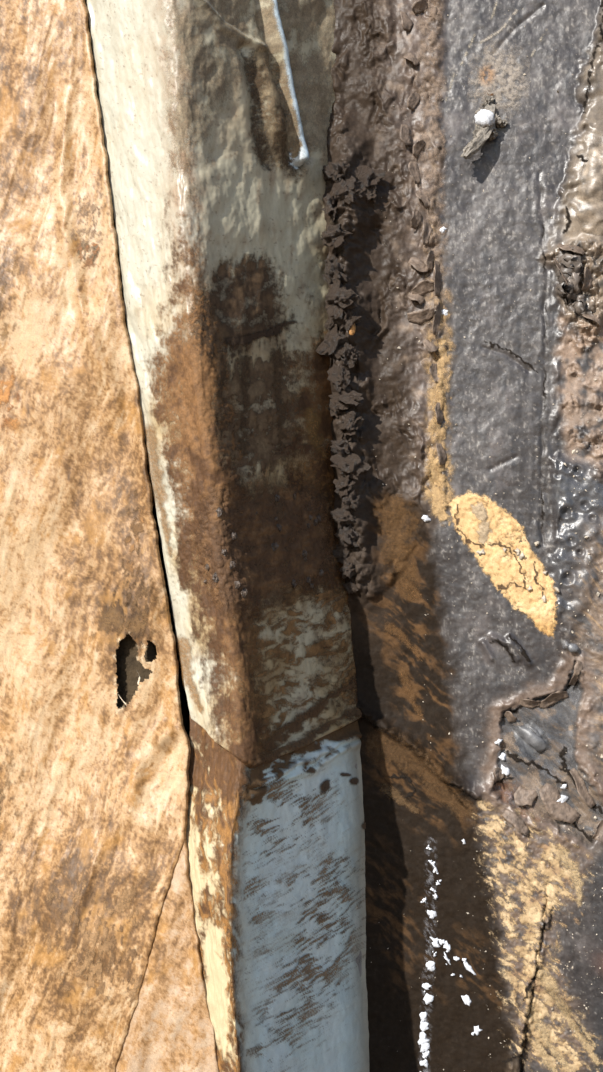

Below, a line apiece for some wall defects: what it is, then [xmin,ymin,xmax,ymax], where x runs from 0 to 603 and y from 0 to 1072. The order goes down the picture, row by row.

corrosion [145,206,362,1072]
damp [367,732,603,1072]
crack [502,852,554,1072]